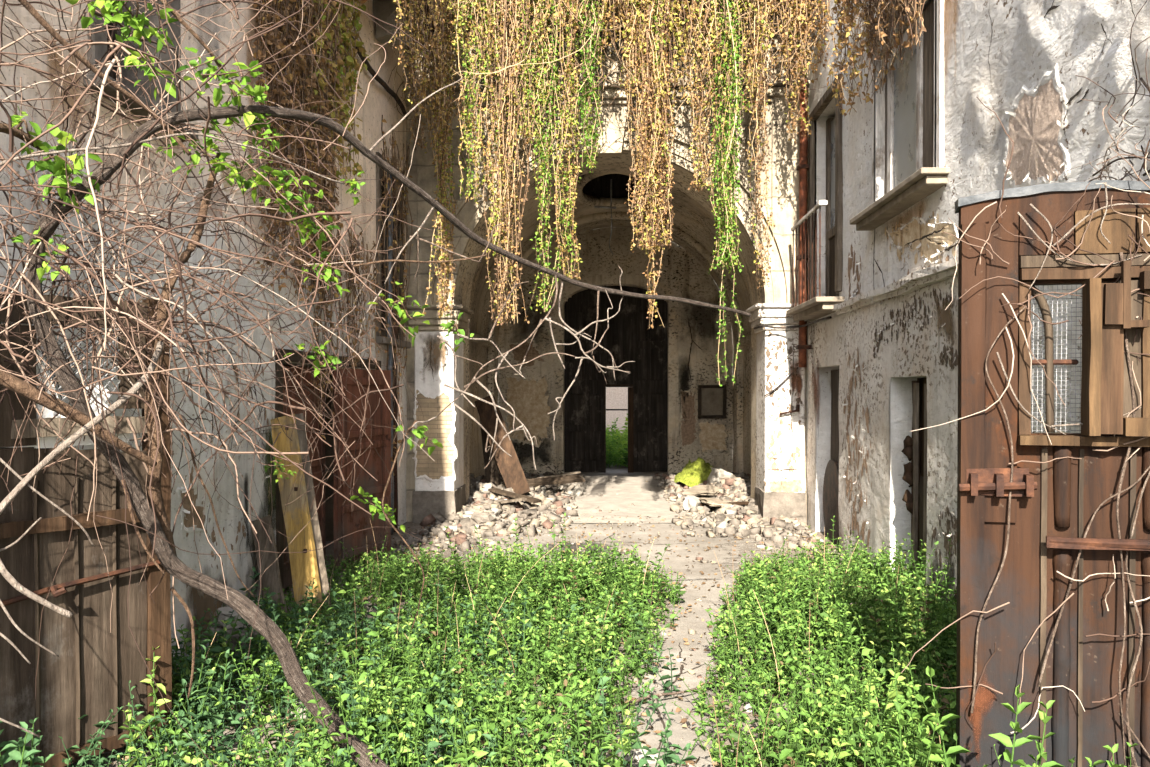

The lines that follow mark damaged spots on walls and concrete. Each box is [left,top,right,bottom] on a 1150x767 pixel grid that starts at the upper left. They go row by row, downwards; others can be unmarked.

flaking render [1002,63,1071,188]
peeling [848,245,861,324]
flaking render [884,210,958,283]
peeling [940,345,958,370]
flaking render [412,388,457,483]
flaking render [764,340,805,493]
peeling [843,285,954,547]
peeling [930,505,957,604]
rust [969,683,995,740]